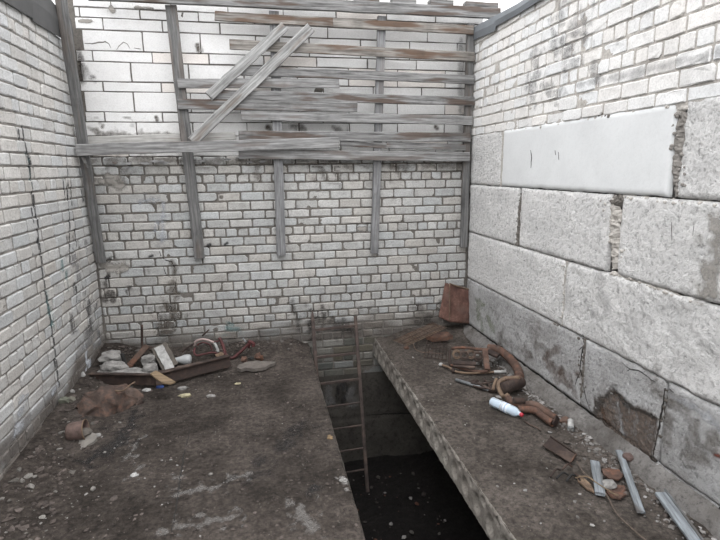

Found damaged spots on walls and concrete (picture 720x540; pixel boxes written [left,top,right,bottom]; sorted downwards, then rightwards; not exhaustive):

water stain [157,261,181,338]
crack [575,336,591,411]
crack [623,363,674,457]
spalling [589,388,720,508]